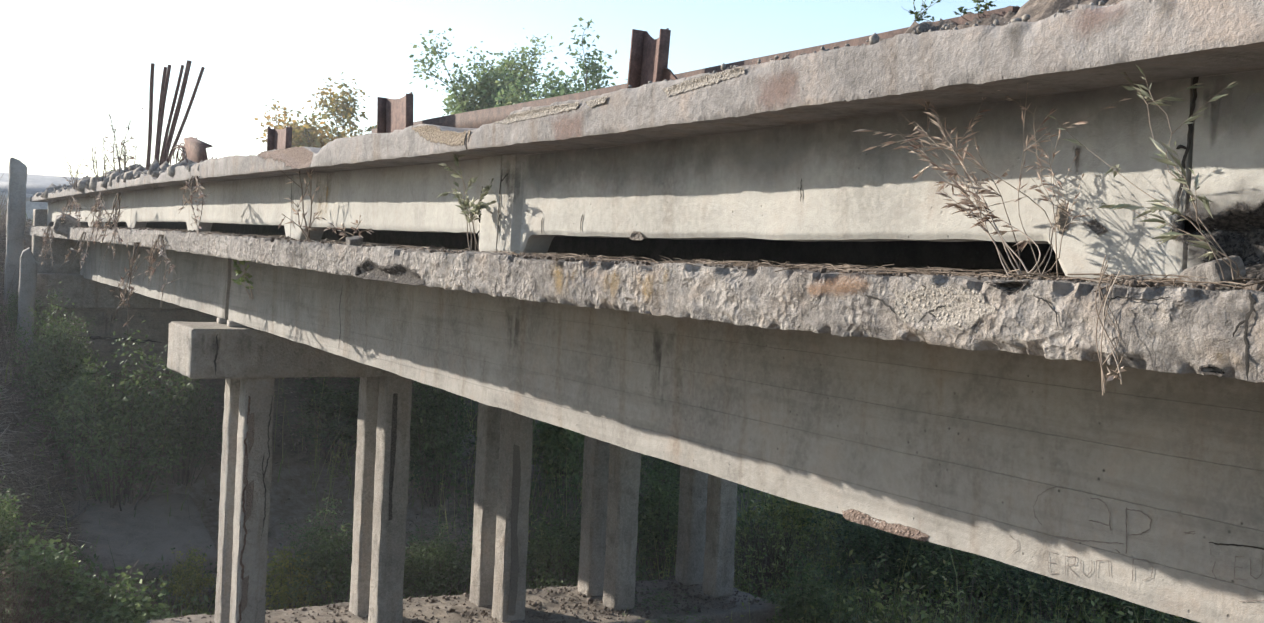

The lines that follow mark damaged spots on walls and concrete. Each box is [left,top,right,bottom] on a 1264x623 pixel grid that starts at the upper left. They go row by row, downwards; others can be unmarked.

crack [1175,77,1199,216]
spalling [355,258,424,285]
spalling [1170,201,1264,285]
crack [1232,292,1256,380]
crack [261,397,273,539]
spalling [842,509,929,542]